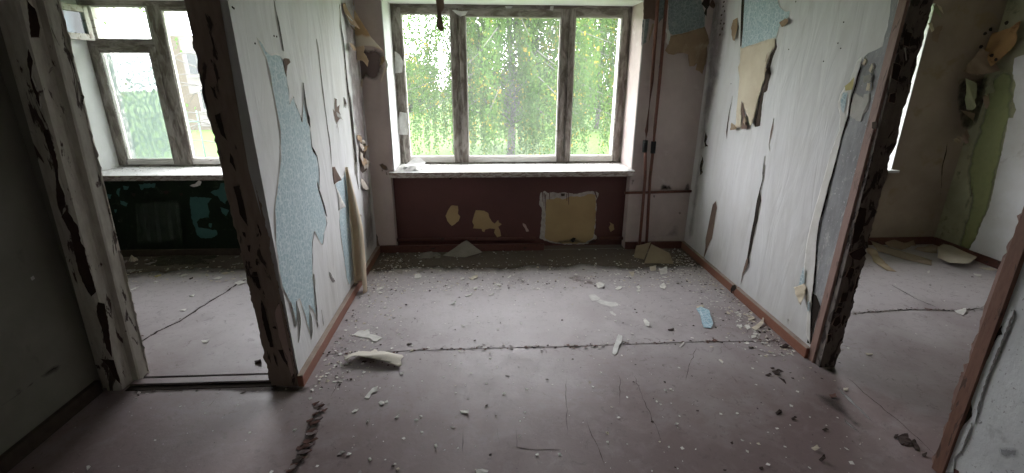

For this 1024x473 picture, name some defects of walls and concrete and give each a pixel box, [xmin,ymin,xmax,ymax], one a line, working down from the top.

peeling [26,0,42,110]
flaking render [811,0,901,345]
peeling [445,205,501,237]
peeling [523,189,614,245]
peeling [43,129,122,385]
crack [141,279,246,342]
peeling [190,183,295,388]
crack [851,284,984,315]
crack [323,338,781,377]